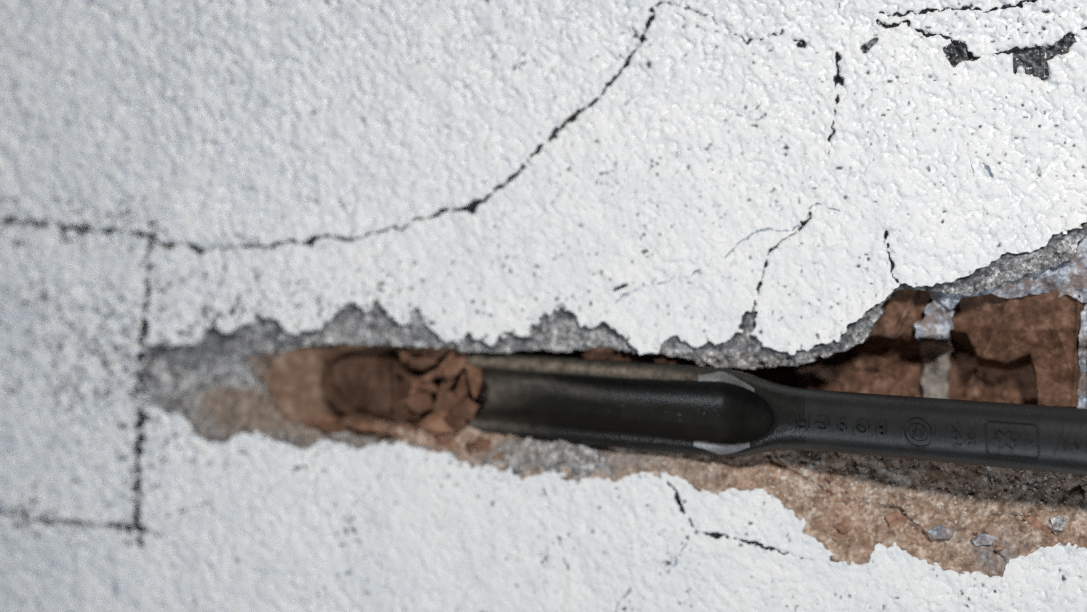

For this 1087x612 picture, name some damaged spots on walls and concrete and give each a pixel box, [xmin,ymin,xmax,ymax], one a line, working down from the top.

crack [828,0,1087,155]
crack [0,1,839,546]
crack [867,230,899,283]
spalling [143,222,1087,577]
crack [667,481,803,574]